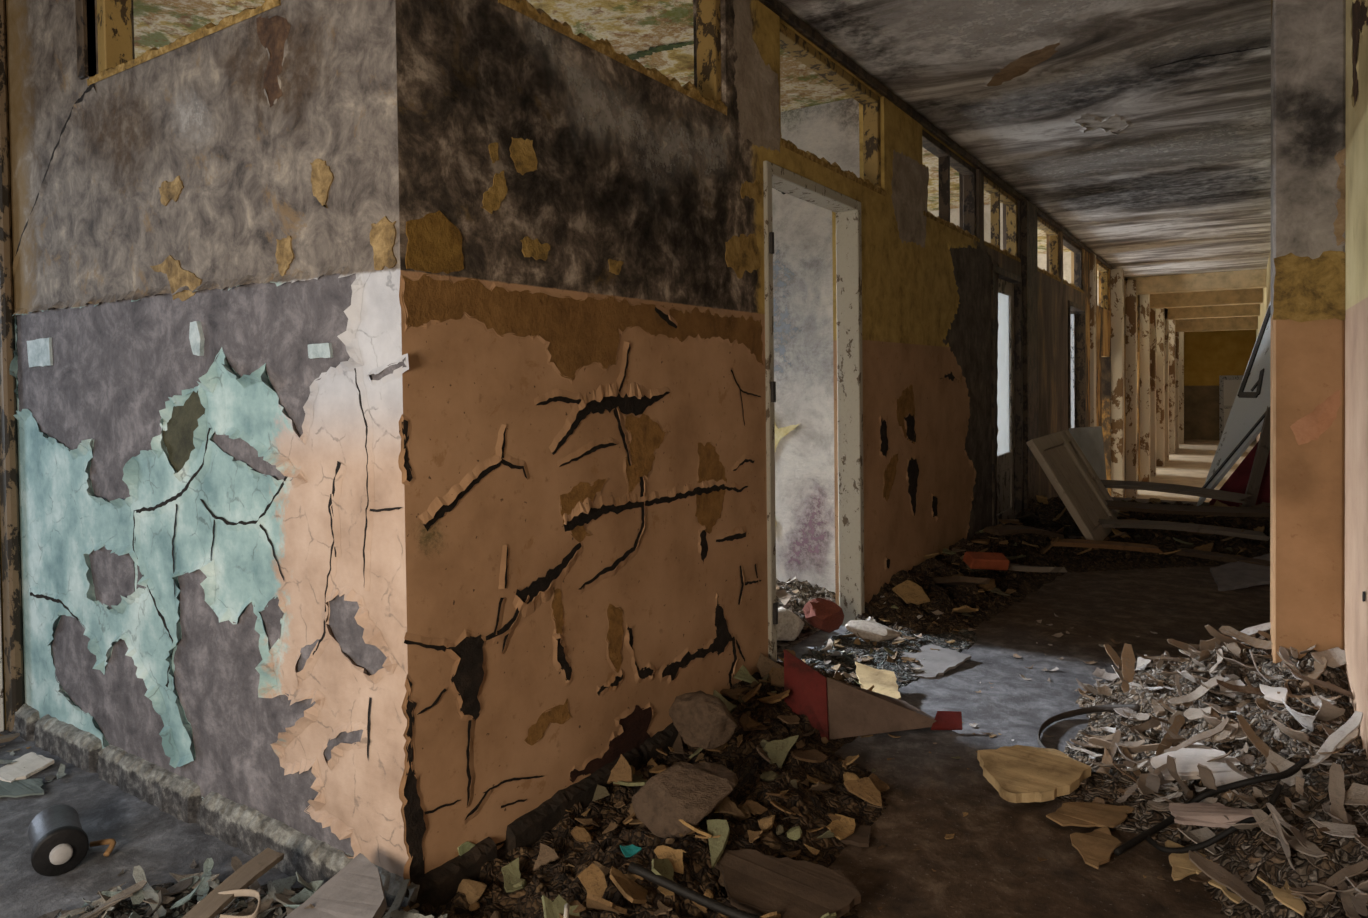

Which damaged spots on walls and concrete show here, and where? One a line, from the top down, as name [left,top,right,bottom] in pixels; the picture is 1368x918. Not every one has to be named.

peeling [9,262,409,509]
peeling [399,271,764,384]
peeling [498,0,1021,544]
crack [29,586,80,620]
crack [132,428,292,691]
spalling [398,414,416,487]
crack [305,338,762,688]
peeling [694,441,728,566]
peeling [47,541,430,886]
crack [365,697,373,758]
crack [417,689,447,715]
crack [420,719,543,846]